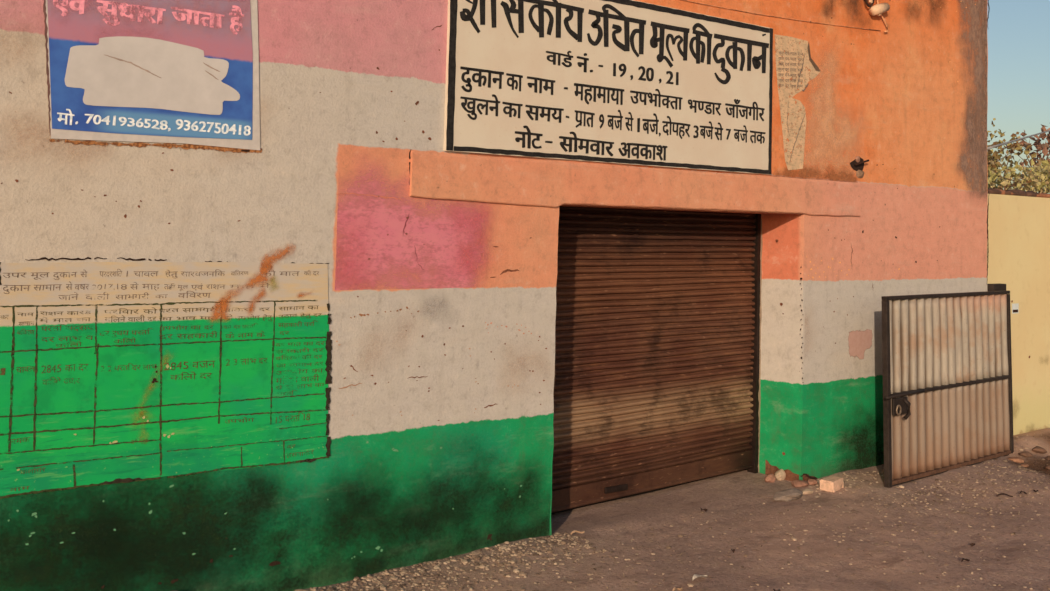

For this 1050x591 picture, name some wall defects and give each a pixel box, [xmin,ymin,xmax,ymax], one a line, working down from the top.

water stain [958,0,987,194]
water stain [0,478,292,591]
water stain [353,557,386,578]
water stain [319,476,550,562]